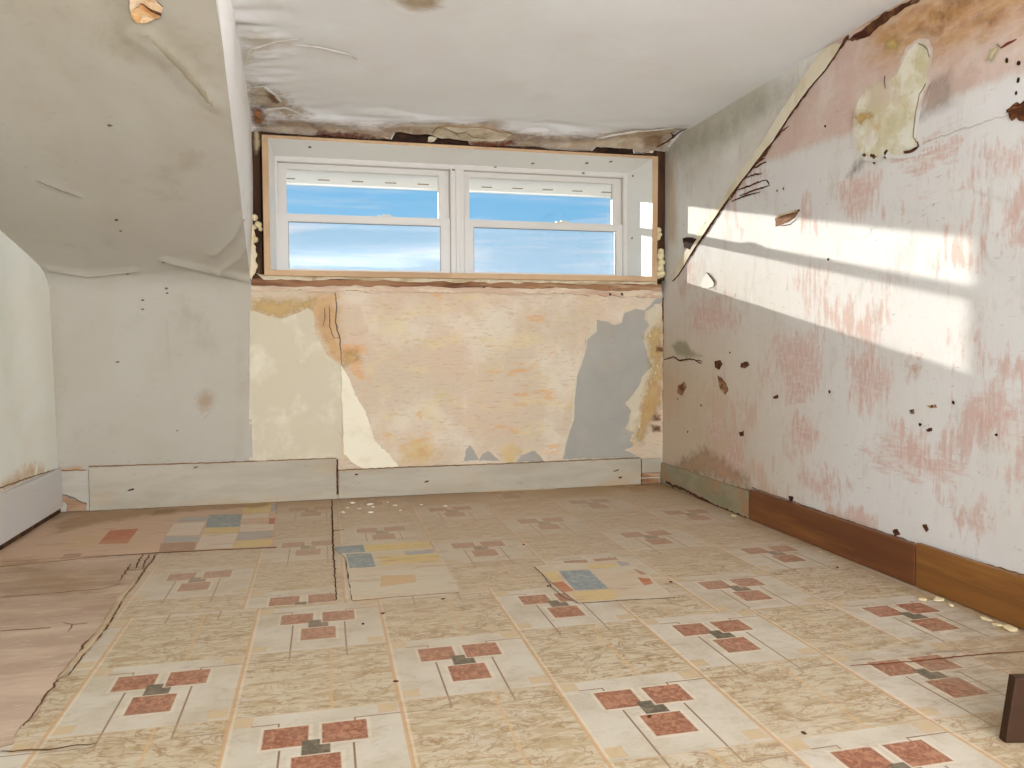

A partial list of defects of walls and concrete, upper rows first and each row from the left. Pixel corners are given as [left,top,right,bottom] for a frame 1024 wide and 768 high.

spalling [382,135,464,146]
water stain [248,85,684,259]
peeling [762,66,1024,240]
spalling [683,237,696,249]
crack [323,293,342,366]
flaking render [561,293,664,478]
crack [664,356,703,364]
peeling [685,273,749,487]
flaking render [464,445,499,461]